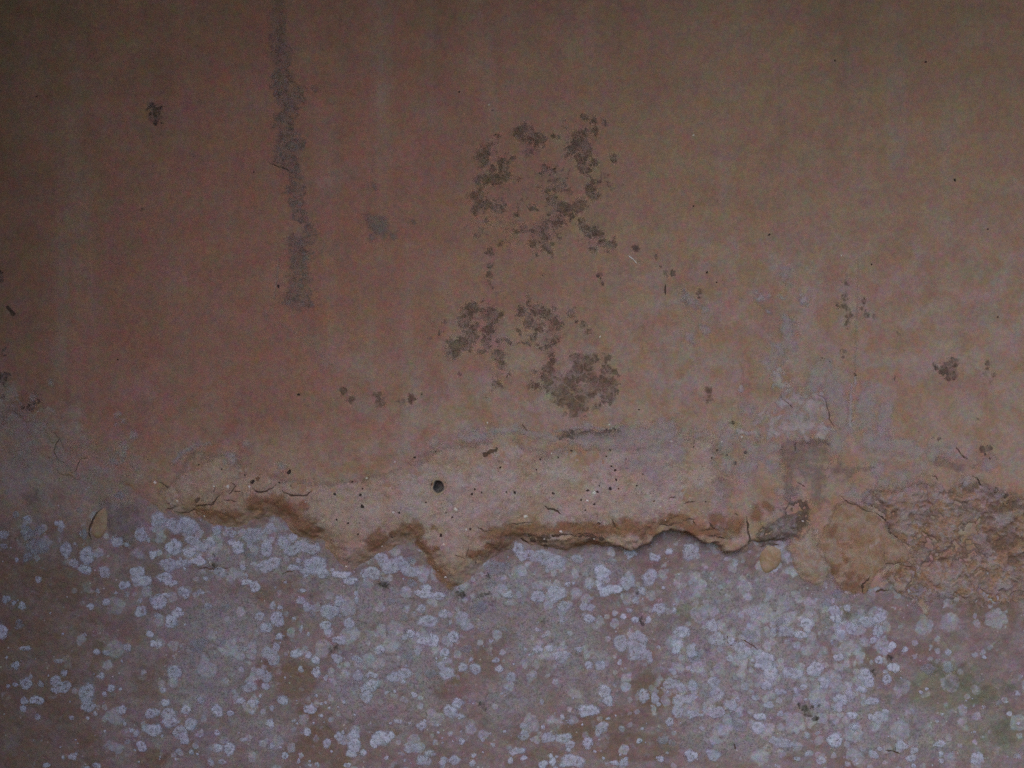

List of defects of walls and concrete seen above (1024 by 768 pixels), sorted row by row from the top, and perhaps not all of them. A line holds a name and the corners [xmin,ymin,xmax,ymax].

spalling [756,499,809,546]
spalling [864,482,1024,608]